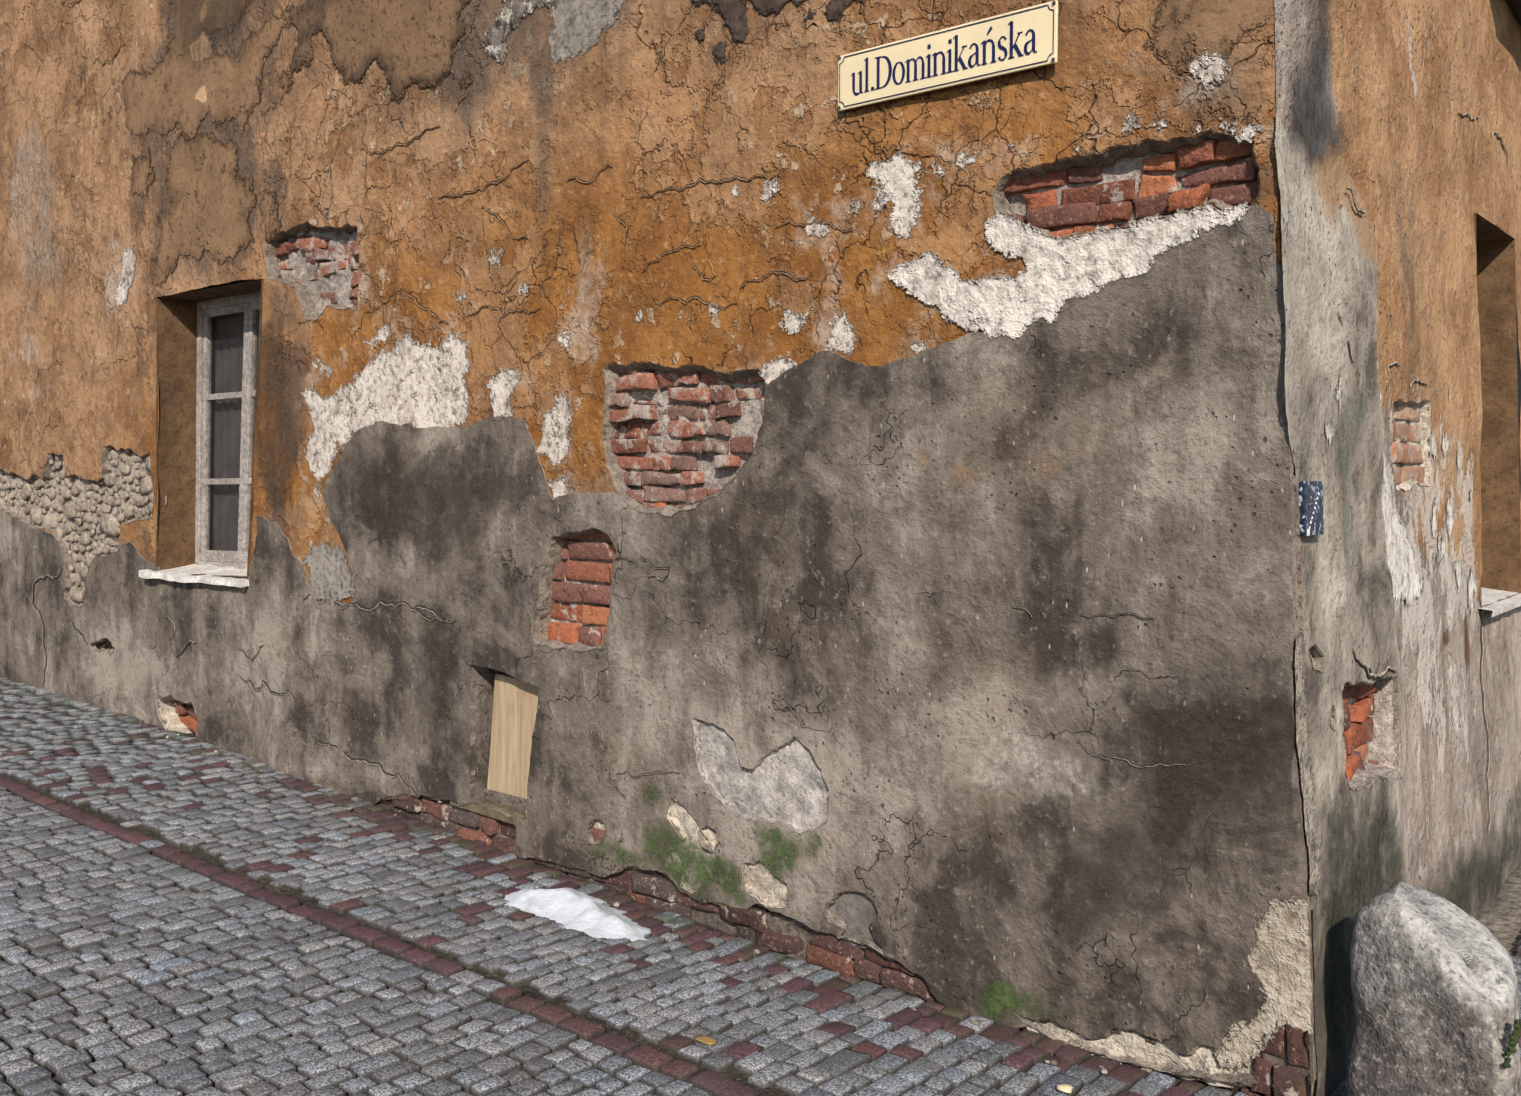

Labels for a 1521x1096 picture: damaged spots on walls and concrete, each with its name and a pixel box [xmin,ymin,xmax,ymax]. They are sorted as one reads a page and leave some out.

peeling [114,0,472,321]
crack [360,91,468,155]
crack [400,286,541,323]
crack [438,160,528,240]
crack [567,164,812,309]
crack [775,220,853,232]
peeling [848,149,979,239]
peeling [888,107,1281,340]
flaking render [601,308,809,517]
flaking render [0,445,167,608]
flaking render [1380,390,1476,611]
flaking render [376,787,942,1004]